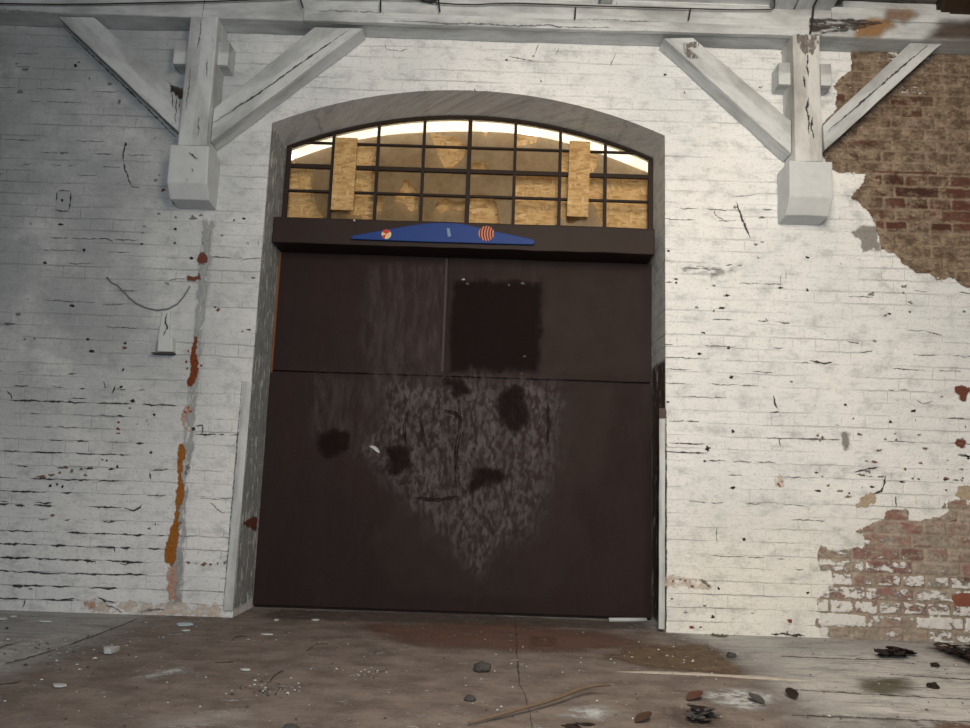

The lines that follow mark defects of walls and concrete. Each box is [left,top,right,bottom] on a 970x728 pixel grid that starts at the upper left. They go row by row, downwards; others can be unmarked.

flaking render [797,18,899,138]
crack [6,139,143,176]
flaking render [822,54,970,287]
corrosion [185,336,203,387]
corrosion [164,444,226,566]
peeling [814,420,898,508]
flaking render [806,442,970,643]
crack [514,617,532,724]